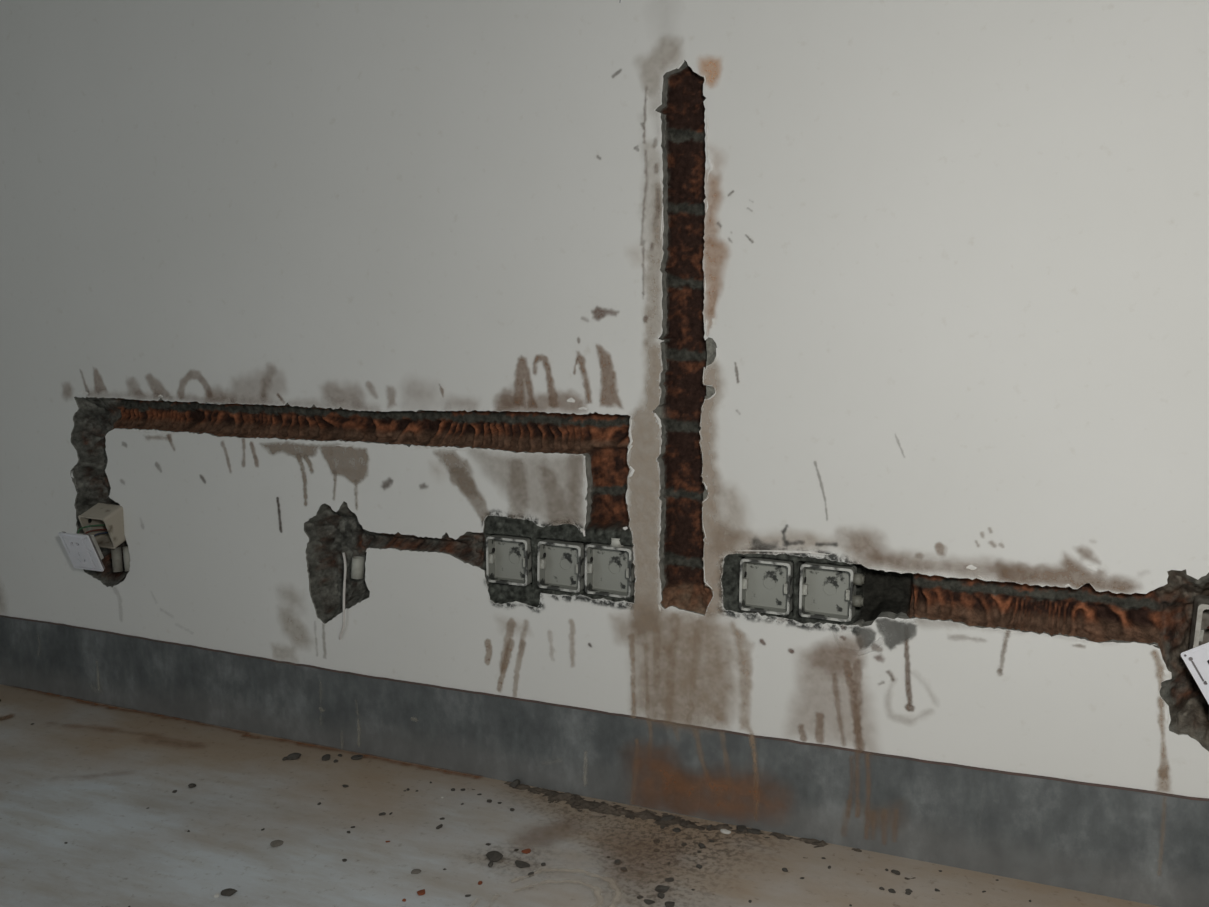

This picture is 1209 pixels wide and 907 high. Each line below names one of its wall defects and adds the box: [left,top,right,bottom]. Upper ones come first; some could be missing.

leakage [503,347,621,409]
hole [1157,569,1209,751]